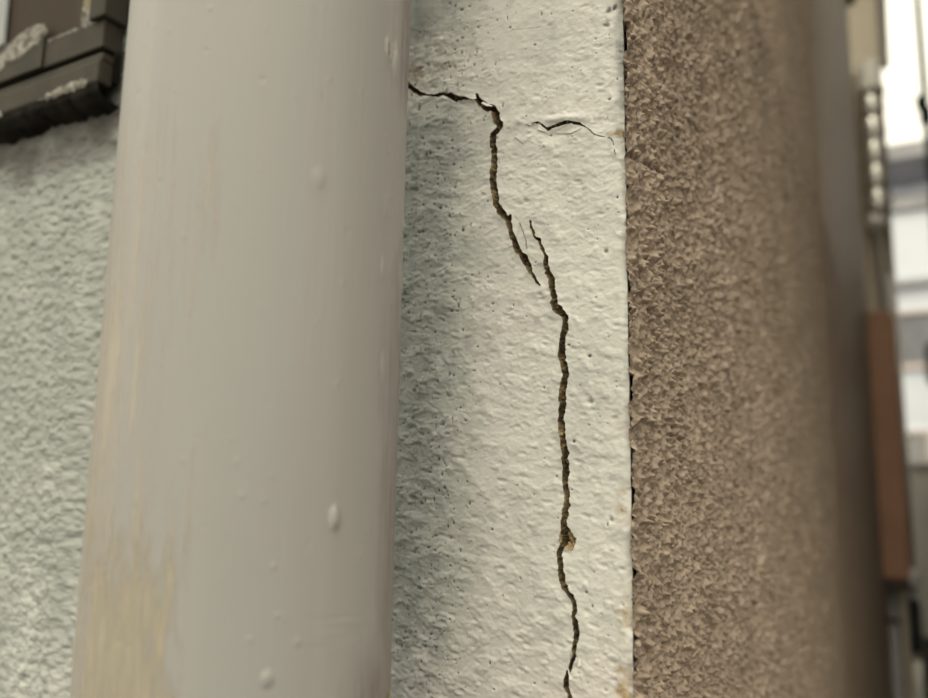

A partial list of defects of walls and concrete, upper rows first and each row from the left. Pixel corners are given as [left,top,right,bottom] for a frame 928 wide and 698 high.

crack [408,80,616,698]